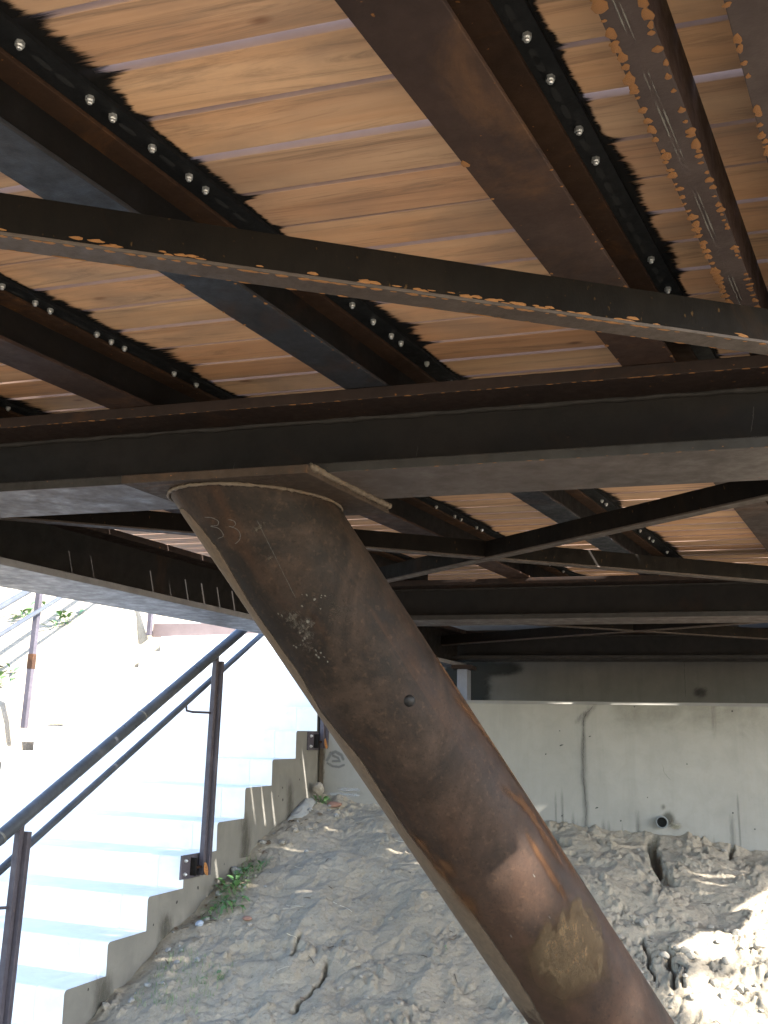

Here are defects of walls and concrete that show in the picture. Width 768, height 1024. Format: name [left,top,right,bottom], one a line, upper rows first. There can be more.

rust [590,0,734,304]
rust [733,33,751,79]
rust [752,105,768,157]
rust [0,228,685,375]
rust [179,508,544,1024]
rust [421,633,598,905]